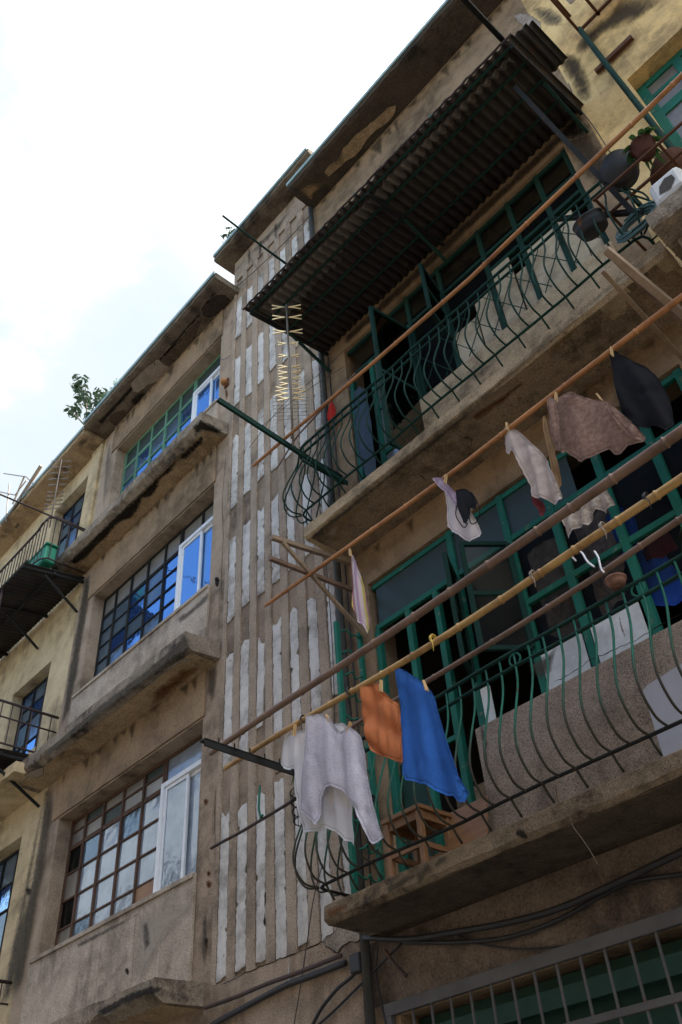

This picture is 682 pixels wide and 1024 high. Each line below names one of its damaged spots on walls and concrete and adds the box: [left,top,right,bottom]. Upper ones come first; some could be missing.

water stain [538,10,561,23]
water stain [580,0,653,49]
spalling [324,105,396,177]